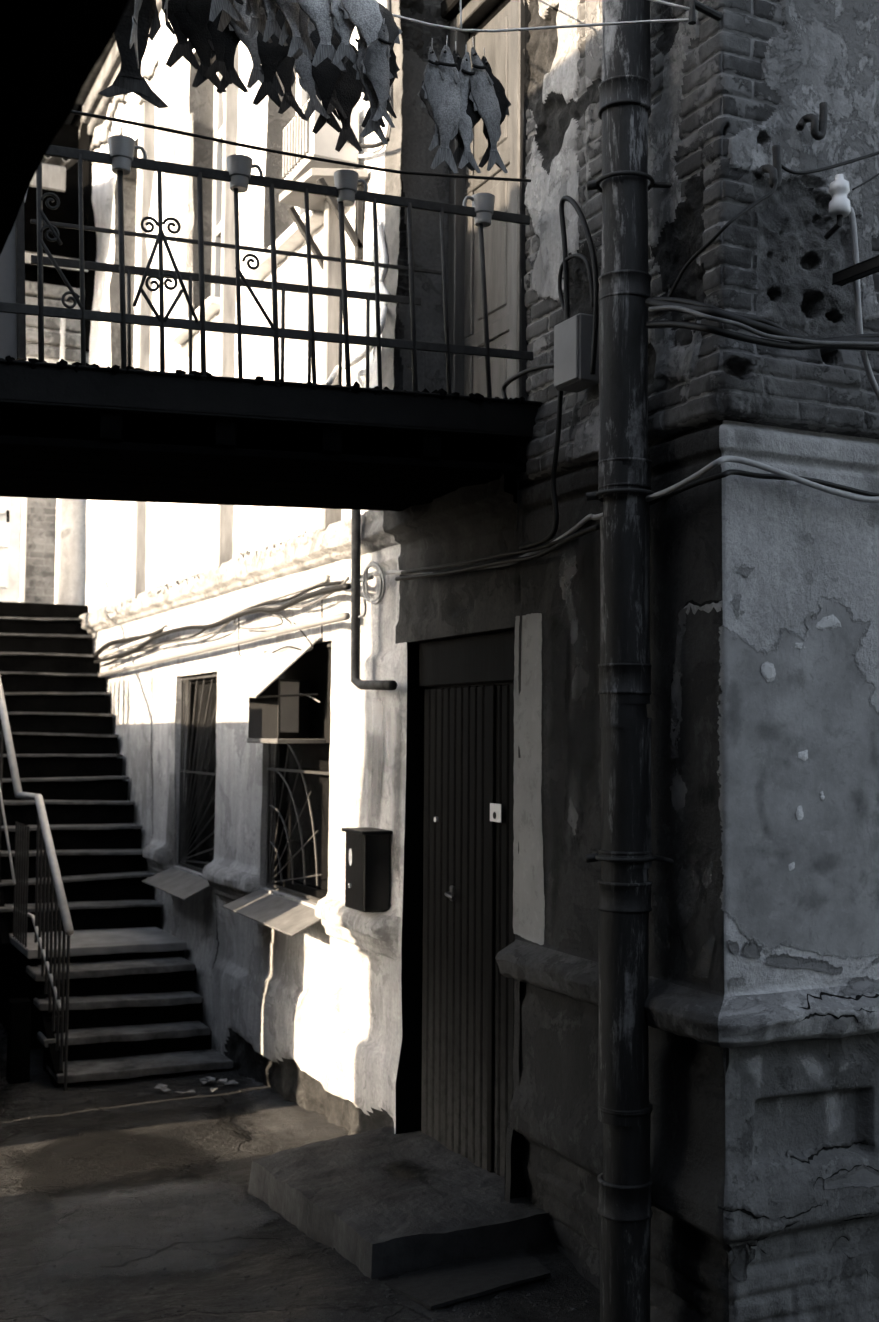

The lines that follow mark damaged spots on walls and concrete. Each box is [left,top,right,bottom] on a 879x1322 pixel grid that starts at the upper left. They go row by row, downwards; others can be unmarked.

spalling [523,109,536,187]
spalling [521,207,599,481]
spalling [575,0,602,276]
spalling [648,0,879,444]
peeling [669,608,687,822]
peeling [701,570,879,996]
crack [718,1136,879,1279]